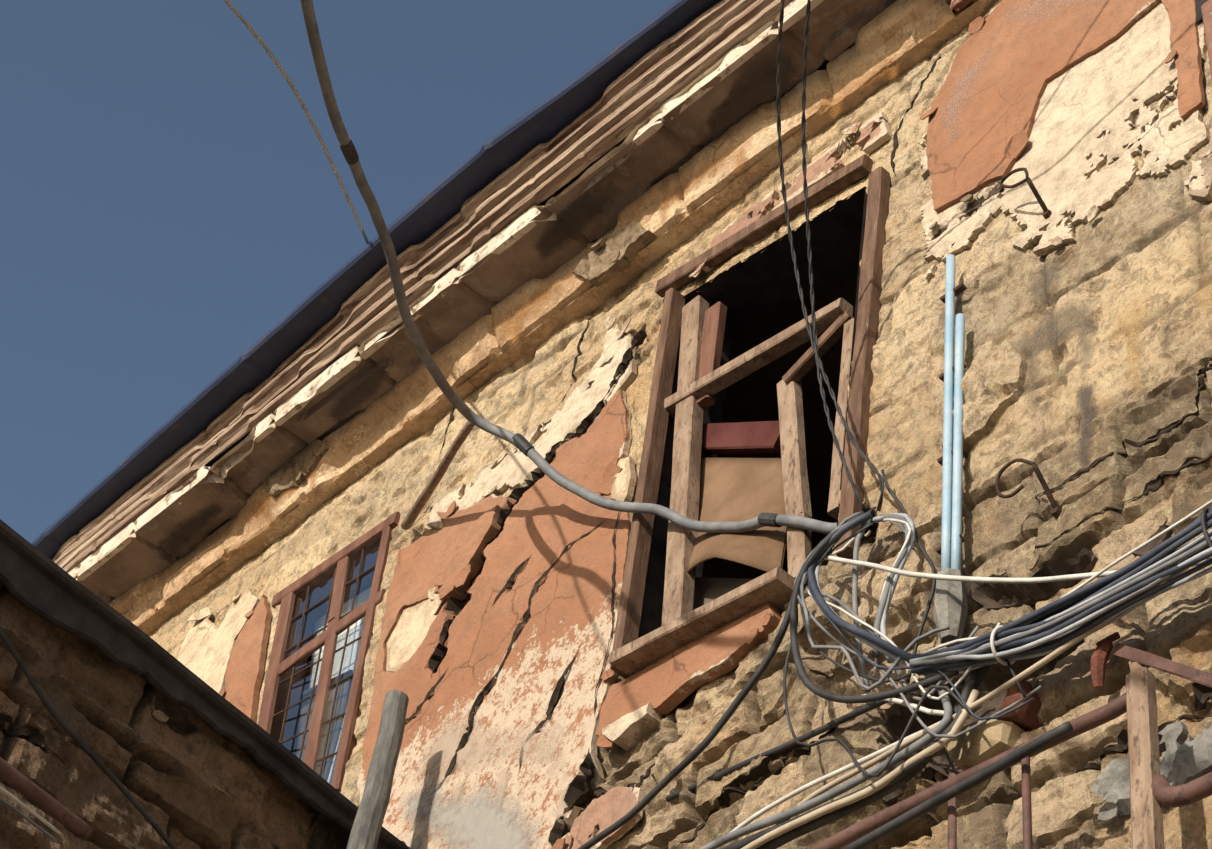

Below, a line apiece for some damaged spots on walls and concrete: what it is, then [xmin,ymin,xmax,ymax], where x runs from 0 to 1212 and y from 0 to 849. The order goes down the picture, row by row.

spalling [572,220,657,287]
peeling [689,112,892,278]
crack [890,56,942,177]
flaking render [920,0,1212,282]
crack [1035,358,1212,500]
crack [405,317,647,794]
peeling [357,314,782,849]
crack [1034,453,1212,551]
spalling [1133,517,1173,556]
flaking render [176,588,272,723]
crack [0,713,65,763]
spalling [306,810,349,849]